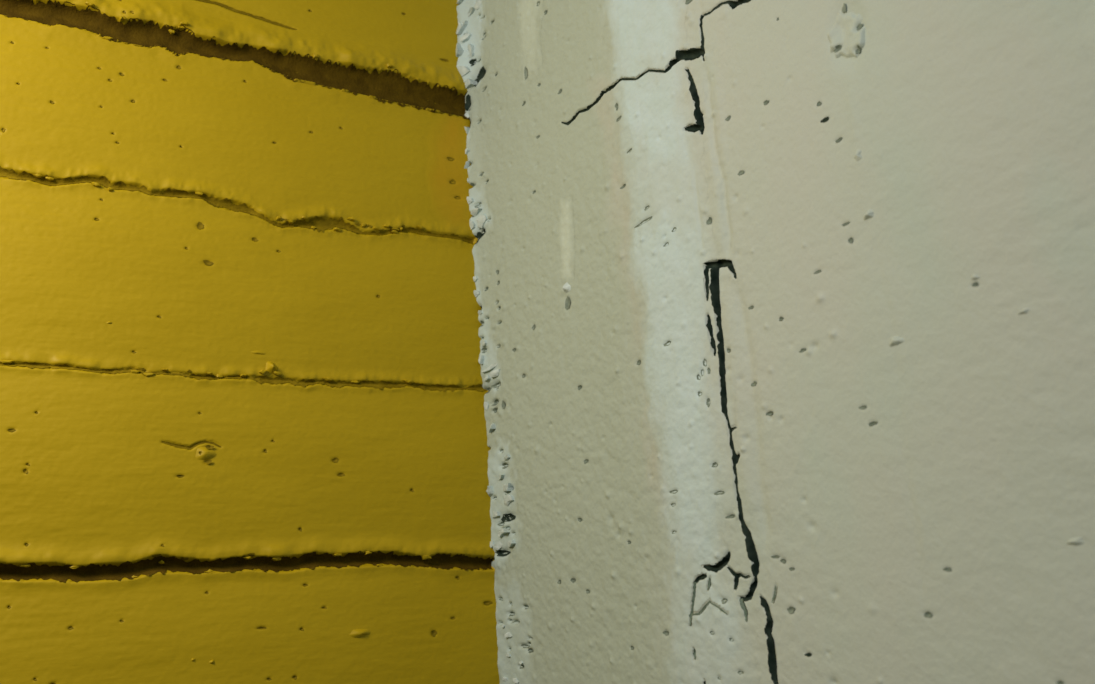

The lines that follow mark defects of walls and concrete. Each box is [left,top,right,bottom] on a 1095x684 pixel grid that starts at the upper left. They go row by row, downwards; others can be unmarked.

crack [0,0,469,119]
crack [561,0,750,134]
crack [0,166,474,244]
crack [0,360,487,392]
crack [689,259,778,684]
crack [0,550,493,582]